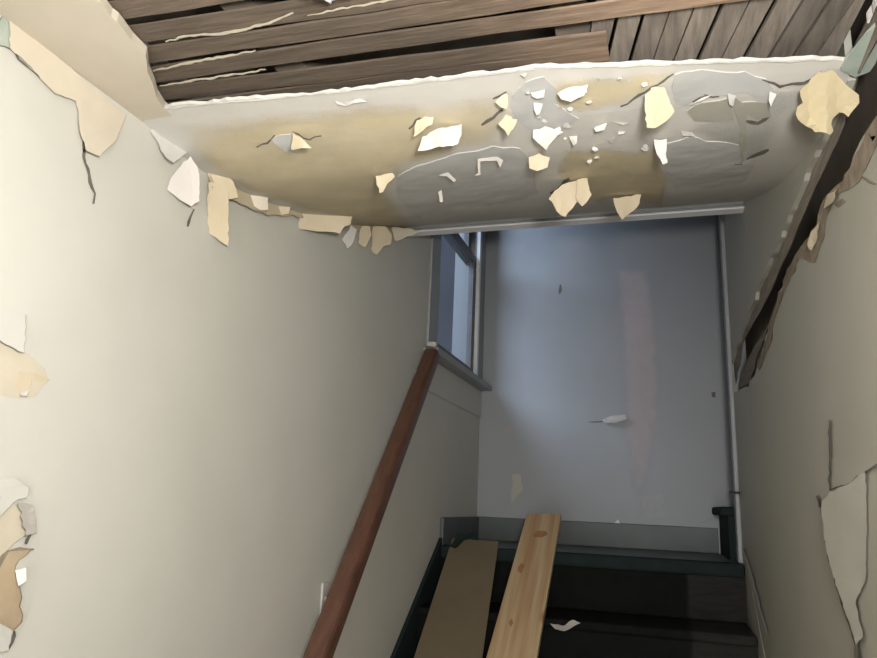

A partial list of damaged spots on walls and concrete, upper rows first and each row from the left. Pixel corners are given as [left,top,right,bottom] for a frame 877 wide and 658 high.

crack [82,141,96,204]
peeling [150,59,859,255]
spalling [757,116,877,370]
peeling [0,307,50,398]
peeling [0,478,37,652]
peeling [816,420,877,658]